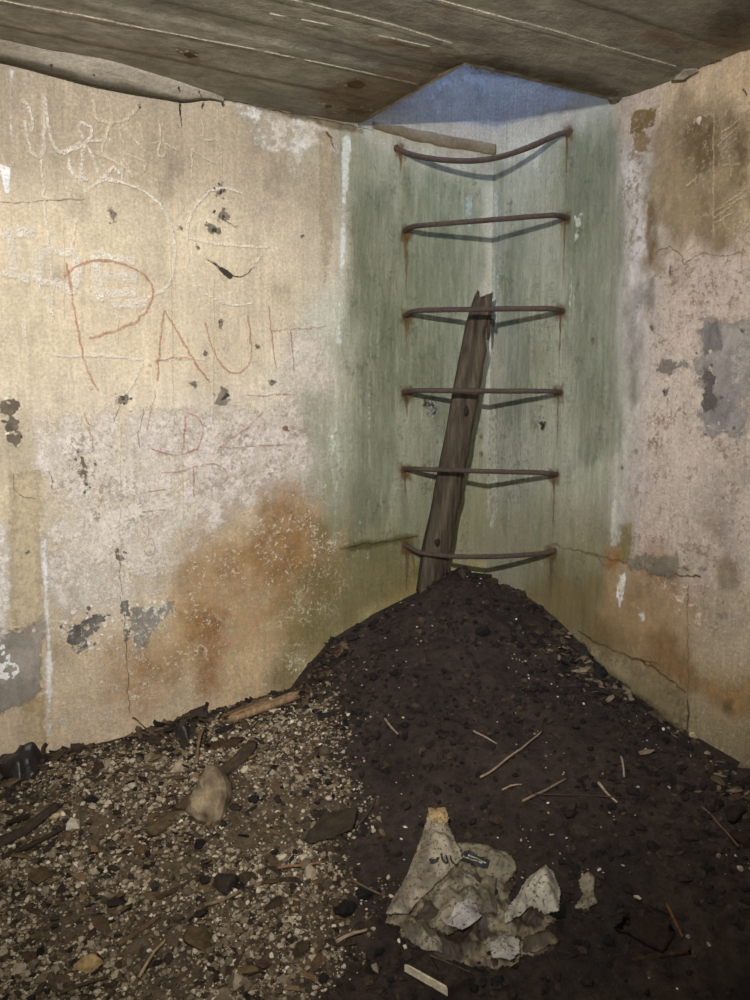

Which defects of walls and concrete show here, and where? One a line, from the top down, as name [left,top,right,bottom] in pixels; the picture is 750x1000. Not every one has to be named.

peeling [0,322,345,744]
water stain [487,400,499,529]
crack [581,587,690,732]
water stain [610,93,746,561]
peeling [619,103,750,630]